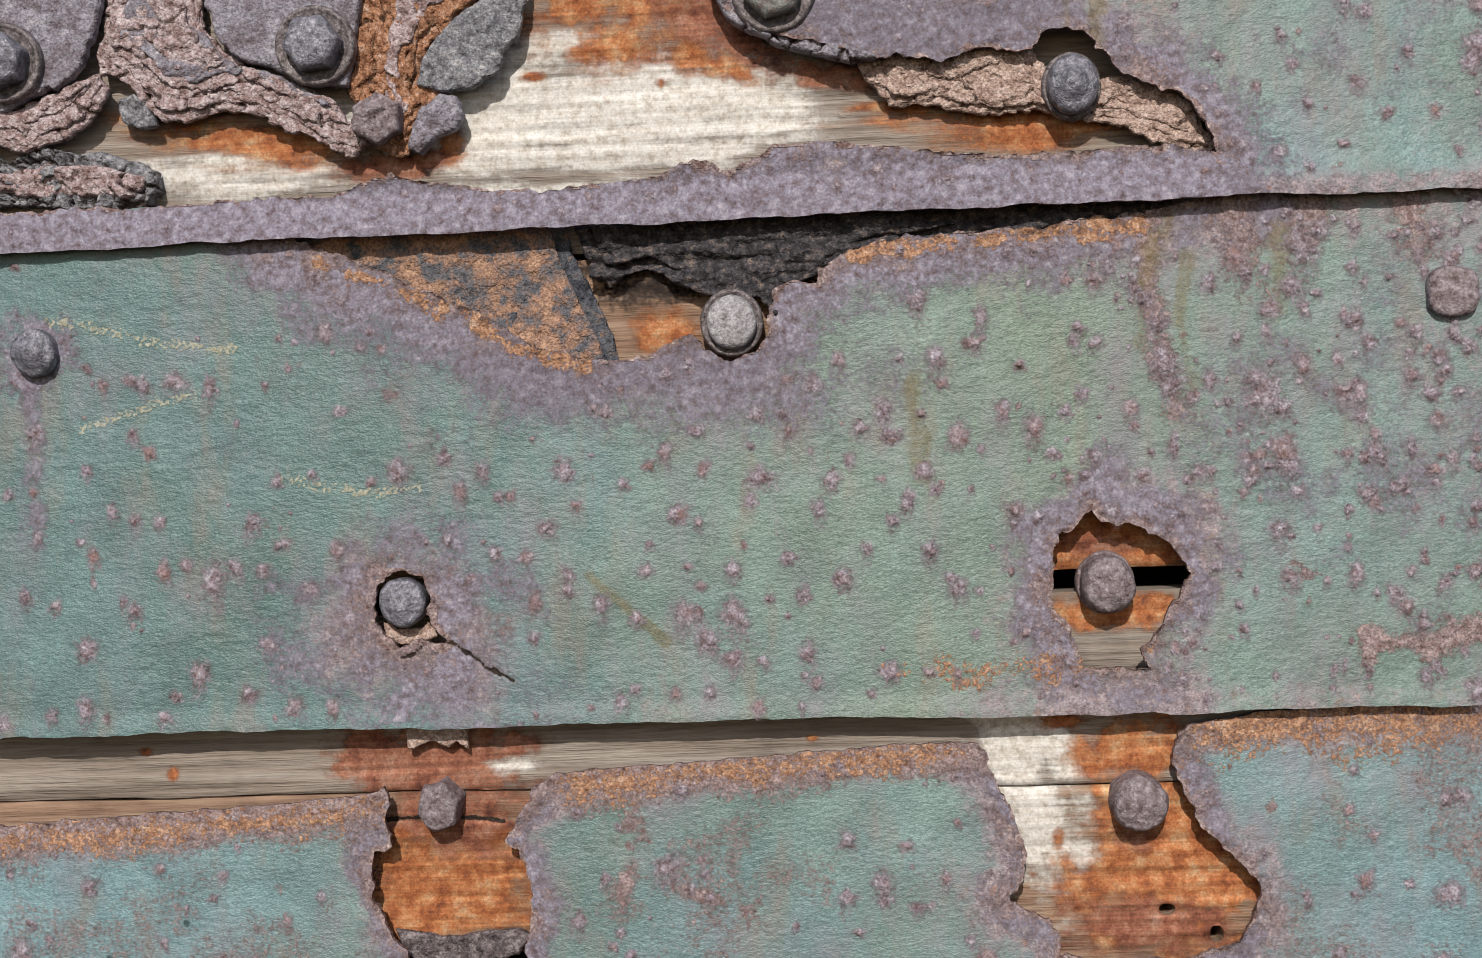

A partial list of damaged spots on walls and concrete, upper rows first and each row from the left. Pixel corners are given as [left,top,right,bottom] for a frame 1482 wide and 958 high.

peeling [337,88,356,121]
peeling [412,30,836,193]
peeling [143,154,342,200]
corrosion [1395,316,1482,429]
crack [401,641,515,682]
corrosion [0,480,1018,958]
peeling [487,758,536,770]
peeling [968,716,1102,895]
corrosion [878,378,1482,958]